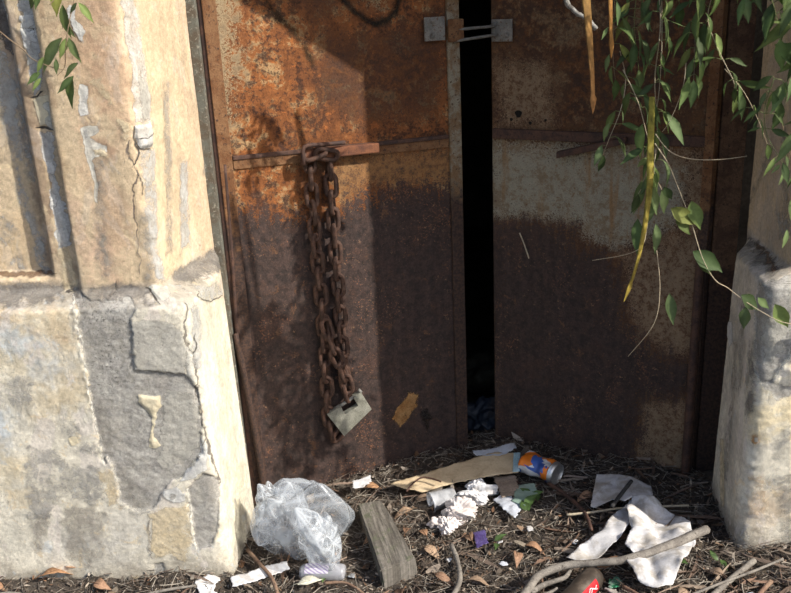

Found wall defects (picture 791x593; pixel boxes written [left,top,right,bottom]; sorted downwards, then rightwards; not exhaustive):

peeling [17,0,72,249]
peeling [67,5,85,41]
peeling [80,126,107,203]
peeling [78,79,112,116]
flaking render [117,0,151,140]
crack [126,138,144,274]
flaking render [72,294,220,575]
flaking render [146,285,170,304]
rust [392,392,431,429]
flaking render [745,275,791,415]